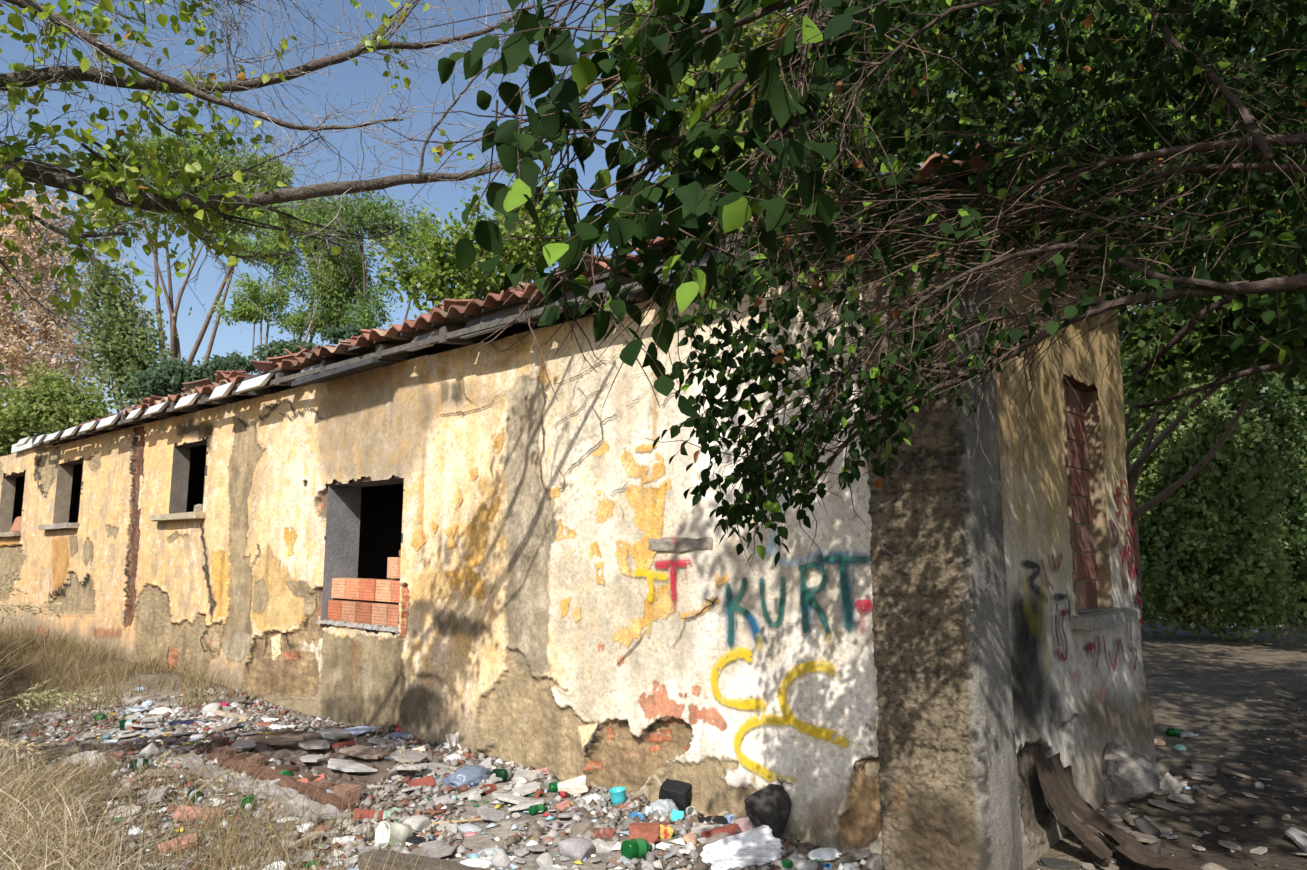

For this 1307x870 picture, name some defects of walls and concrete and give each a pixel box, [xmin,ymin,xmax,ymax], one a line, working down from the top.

crack [238,399,335,435]
crack [442,383,501,418]
crack [539,354,683,508]
peeling [34,376,766,818]
spalling [353,809,384,821]
flaking render [837,756,882,849]